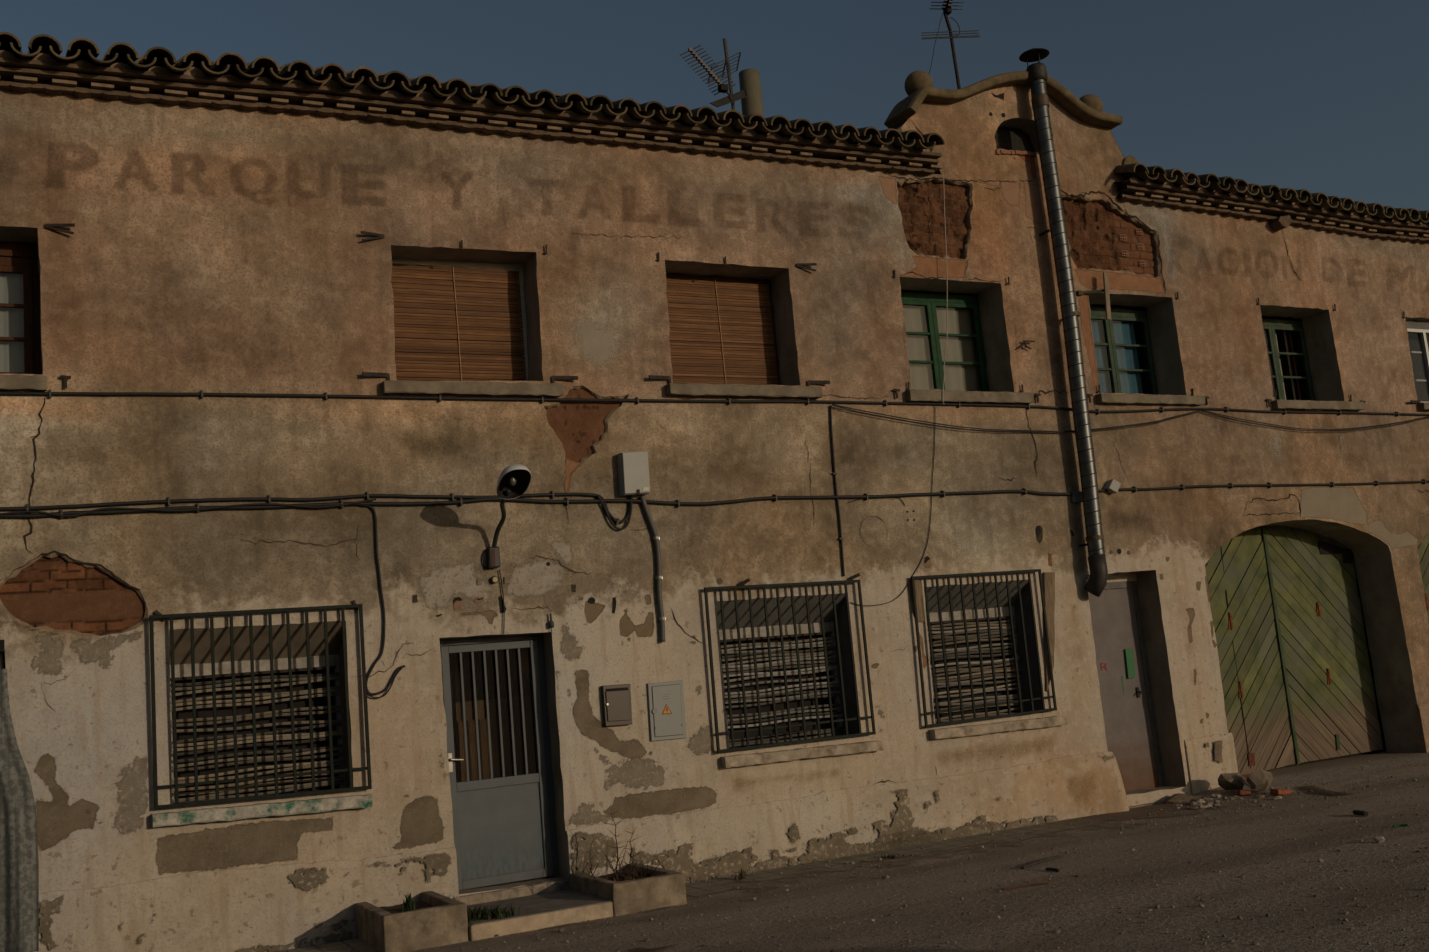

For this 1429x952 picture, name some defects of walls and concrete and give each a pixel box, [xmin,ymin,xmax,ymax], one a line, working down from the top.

flaking render [879,149,1044,278]
flaking render [1062,199,1164,392]
flaking render [545,388,626,492]
crack [0,400,140,590]
flaking render [0,556,145,678]
peeling [419,541,573,627]
peeling [579,598,605,623]
peeling [620,595,654,644]
peeling [34,754,149,850]
peeling [156,818,349,891]
peeling [373,795,451,883]
peeling [556,623,1058,883]